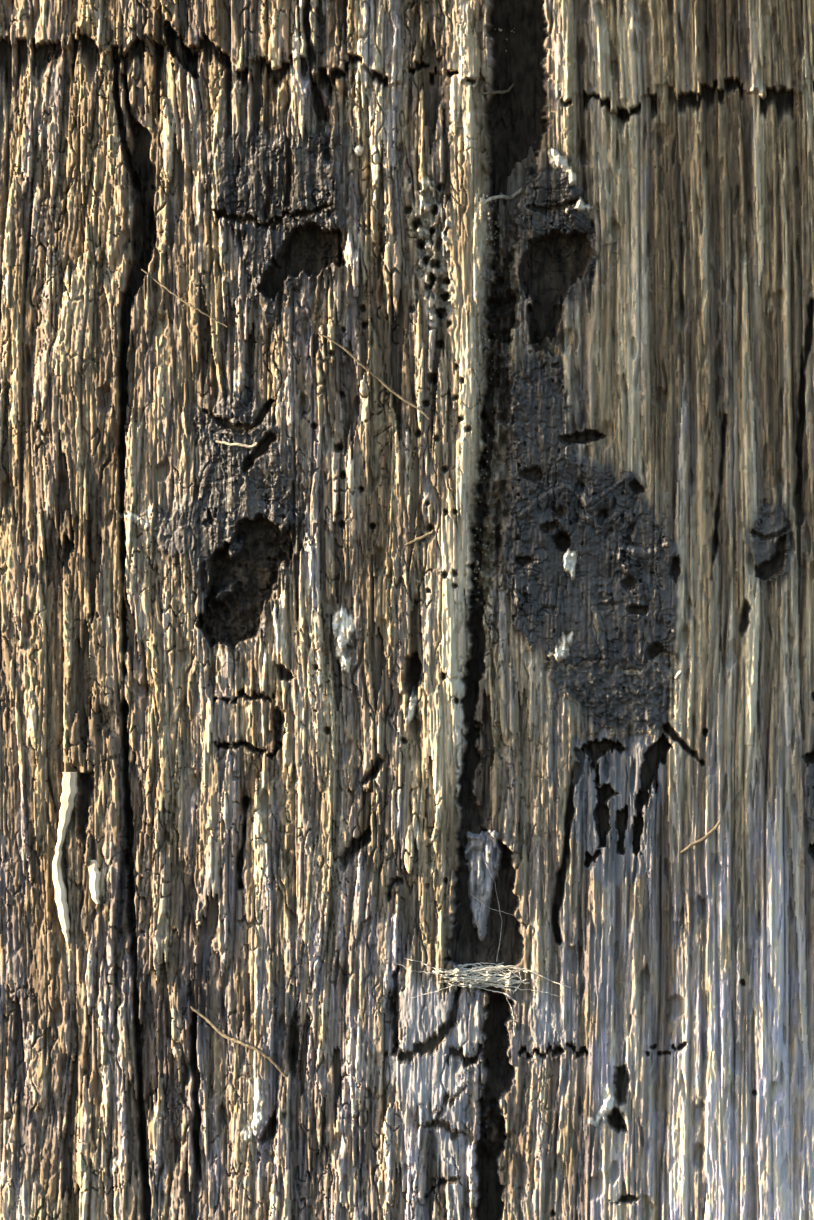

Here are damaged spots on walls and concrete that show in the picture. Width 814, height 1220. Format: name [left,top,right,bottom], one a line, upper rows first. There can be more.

spalling [558,429,606,446]
spalling [518,465,546,484]
spalling [628,479,645,494]
peeling [227,536,246,561]
spalling [514,555,534,567]
peeling [540,504,581,580]
spalling [668,557,681,583]
peeling [212,580,238,606]
spalling [621,575,647,615]
crack [0,0,388,1220]
crack [382,0,814,1220]
spalling [803,751,814,766]